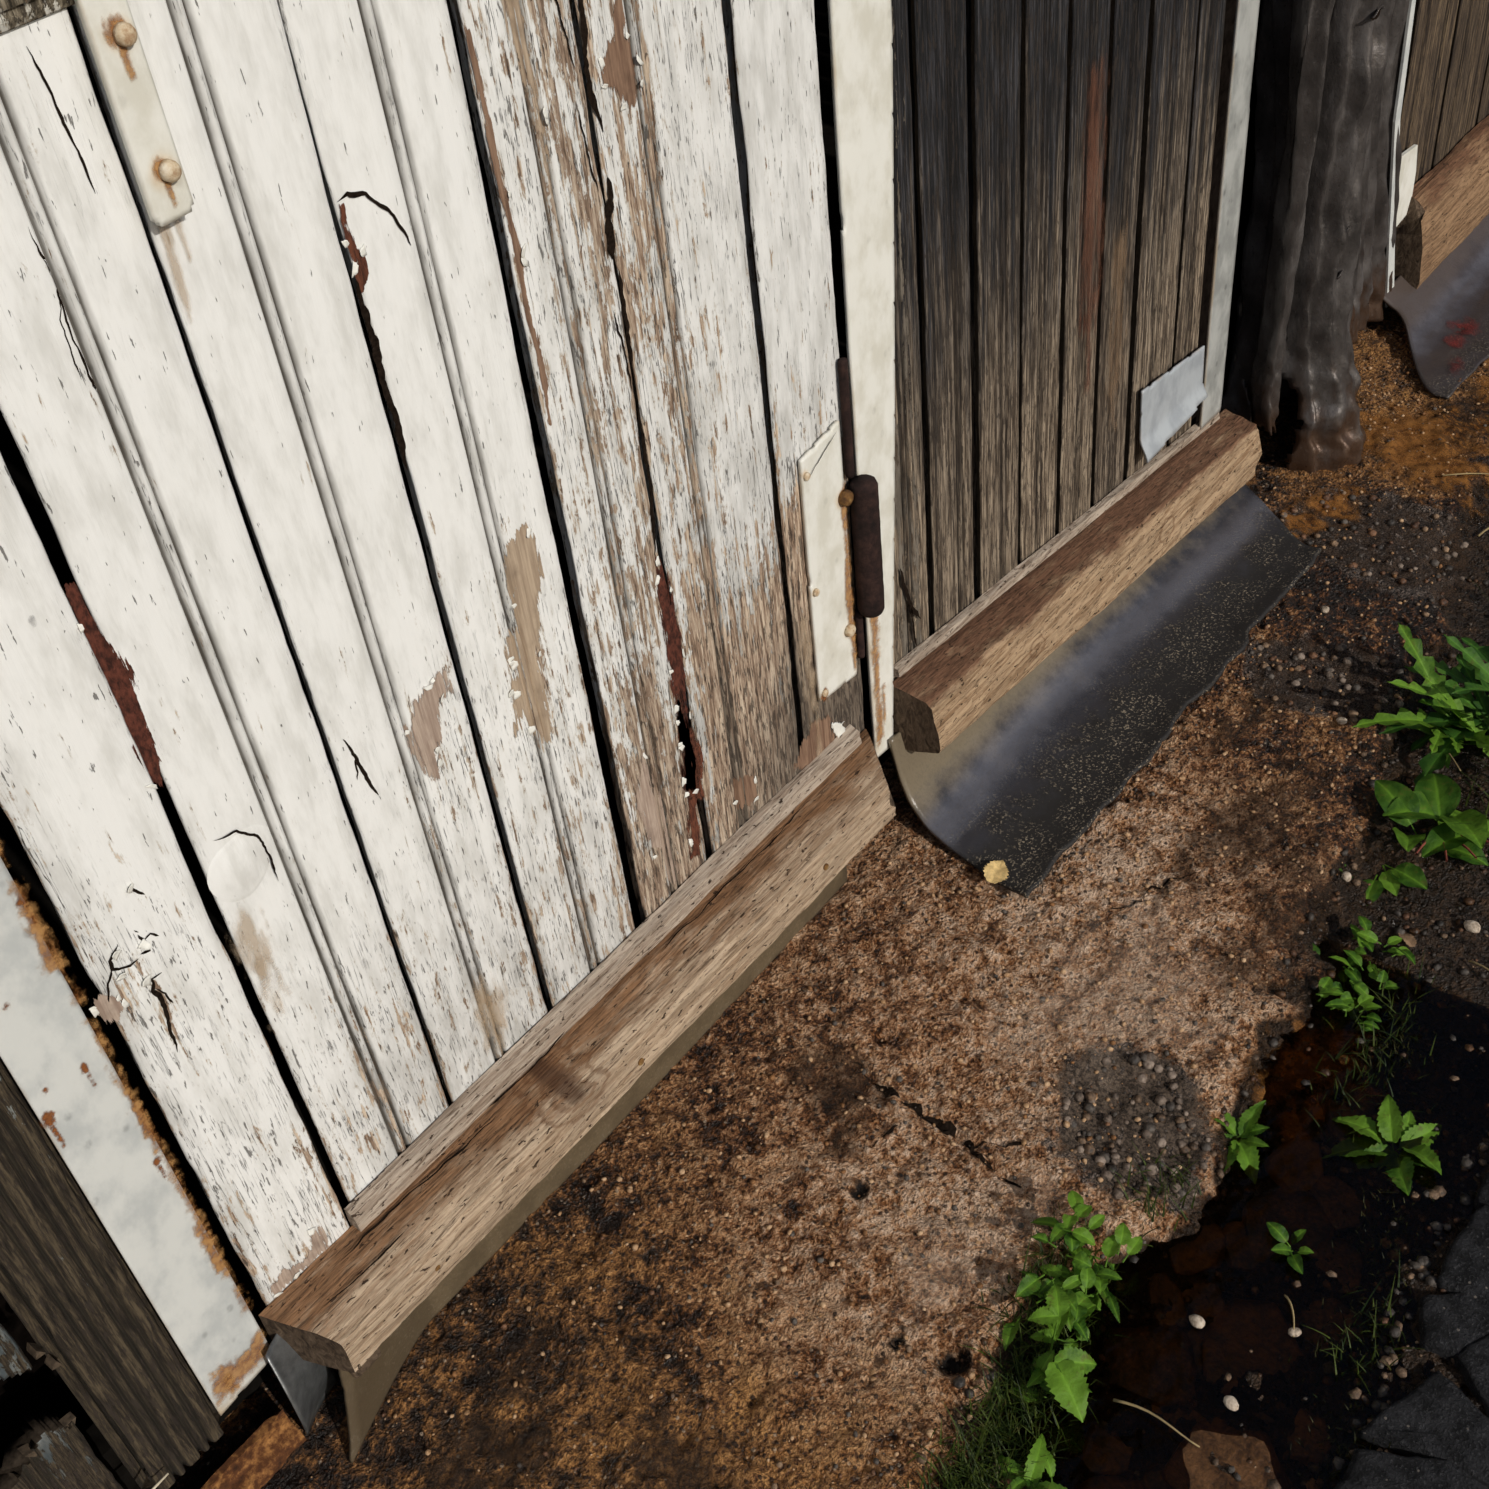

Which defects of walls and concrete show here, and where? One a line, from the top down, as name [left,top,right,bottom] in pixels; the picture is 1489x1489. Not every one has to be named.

rust [105,18,136,79]
peeling [598,0,644,114]
rust [153,160,176,205]
crack [339,191,411,245]
crack [356,281,408,470]
peeling [503,521,553,743]
peeling [403,667,454,782]
crack [850,1061,1028,1188]